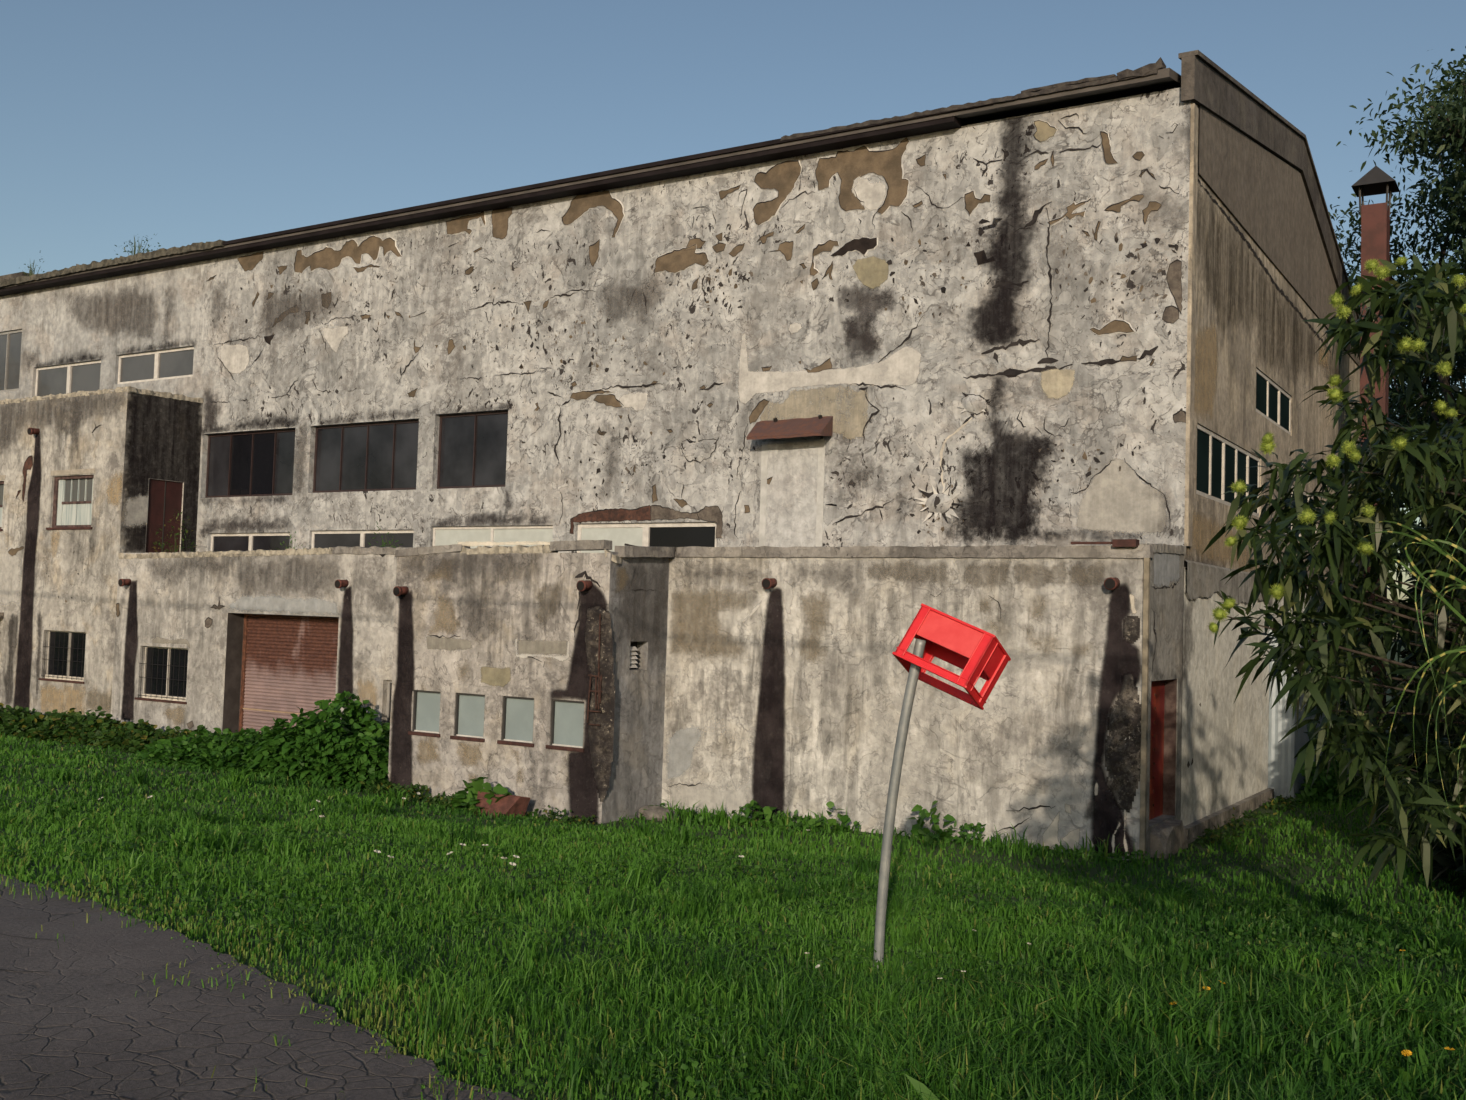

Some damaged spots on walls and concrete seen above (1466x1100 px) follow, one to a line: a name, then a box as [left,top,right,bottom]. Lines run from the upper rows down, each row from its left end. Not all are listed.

damp [0,393,337,720]
peeling [212,235,402,345]
peeling [561,190,625,267]
peeling [655,137,996,318]
crack [850,316,923,444]
crack [939,416,972,486]
damp [968,117,1031,346]
damp [957,378,1057,541]
crack [859,113,1158,440]
damp [389,592,438,794]
damp [752,588,785,822]
damp [966,565,1142,857]